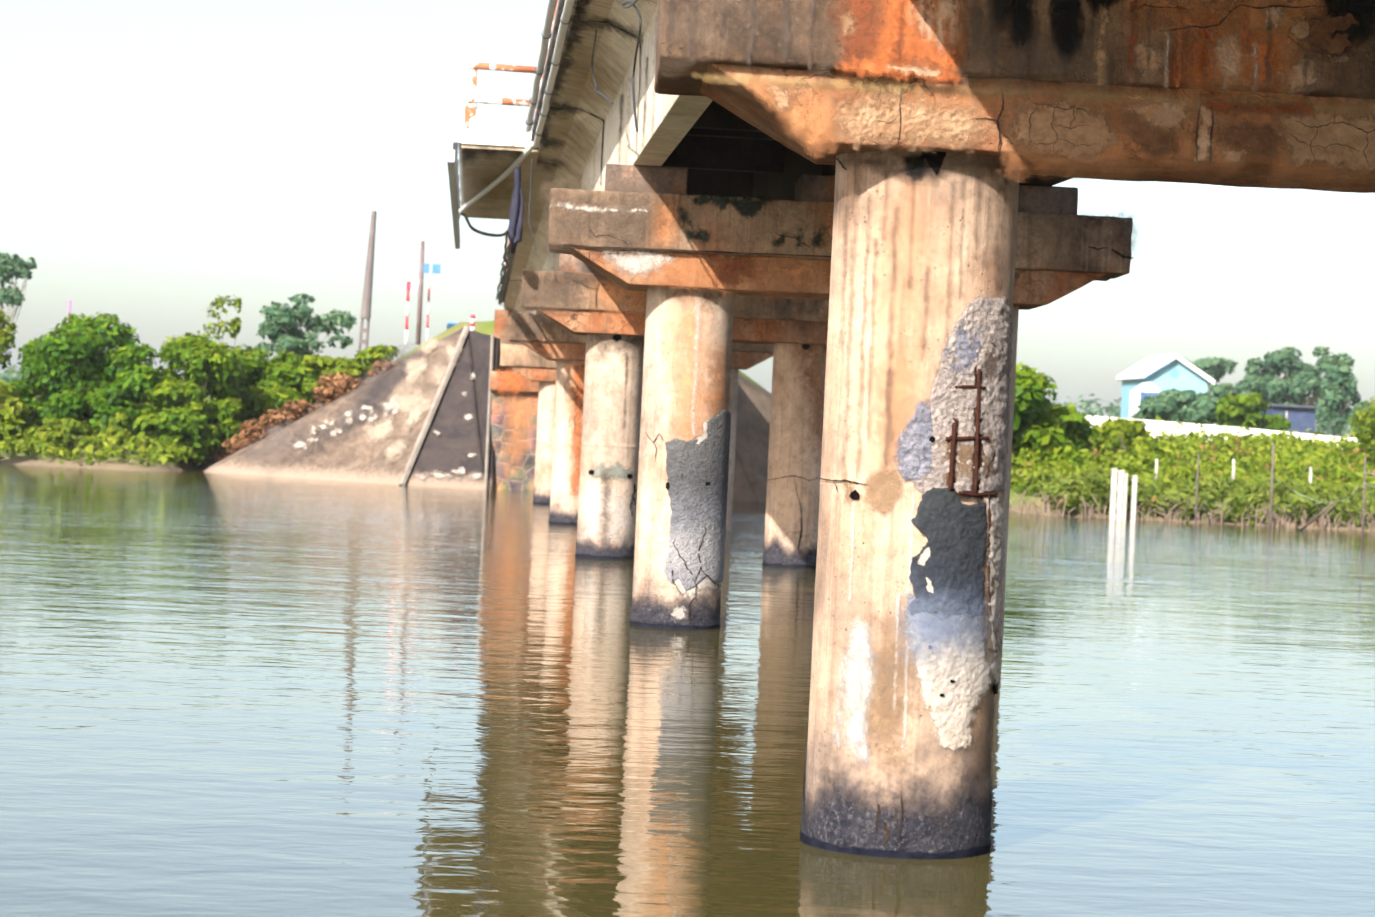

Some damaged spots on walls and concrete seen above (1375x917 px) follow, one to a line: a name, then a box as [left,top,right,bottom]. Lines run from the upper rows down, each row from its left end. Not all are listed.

corrosion [836,0,963,81]
leakage [966,0,1118,99]
leakage [1325,0,1375,59]
crack [969,90,1092,153]
leakage [1193,99,1316,163]
crack [1288,114,1375,167]
corrosion [599,201,831,313]
corrosion [820,205,834,239]
corrosion [567,360,585,492]
crack [769,475,867,550]
spalling [895,296,1012,694]
leakage [800,770,993,859]